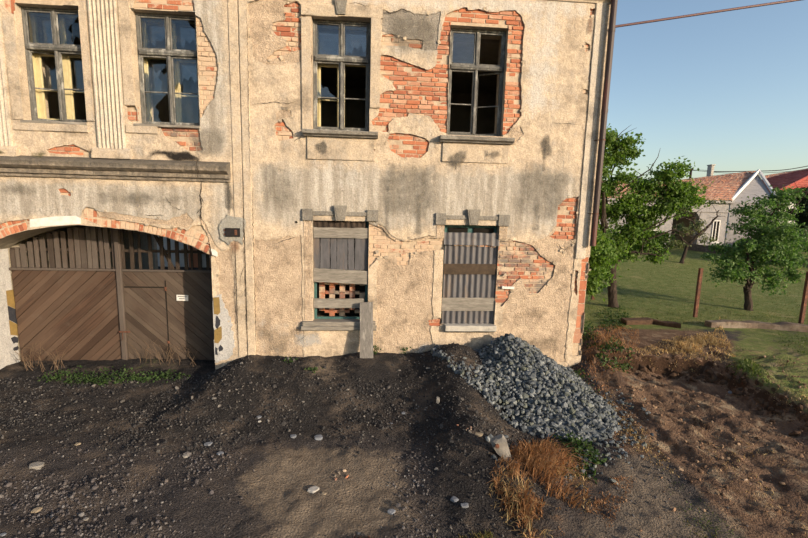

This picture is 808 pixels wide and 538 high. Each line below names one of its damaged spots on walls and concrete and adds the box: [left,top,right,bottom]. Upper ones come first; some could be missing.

spalling [3,0,73,14]
peeling [247,0,312,66]
spalling [134,0,220,117]
spalling [371,7,526,158]
spalling [48,144,91,156]
spalling [127,106,139,123]
spalling [161,128,203,152]
spalling [272,106,296,141]
spalling [0,217,29,239]
spalling [81,207,237,329]
peeling [490,196,591,362]